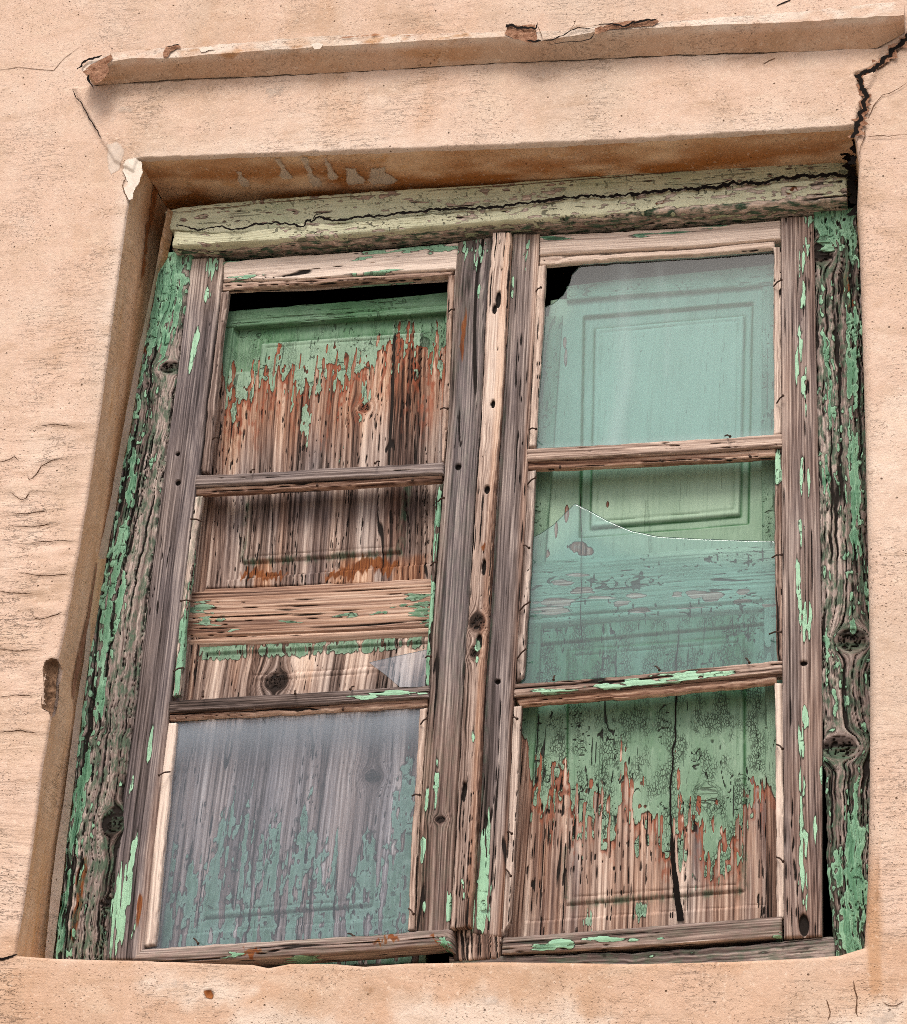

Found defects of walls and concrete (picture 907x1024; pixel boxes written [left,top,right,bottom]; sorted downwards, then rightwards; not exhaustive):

spalling [505,22,541,43]
spalling [594,19,659,34]
spalling [77,54,113,87]
crack [72,89,101,137]
crack [175,33,907,231]
peeling [107,142,143,200]
spalling [41,658,59,717]